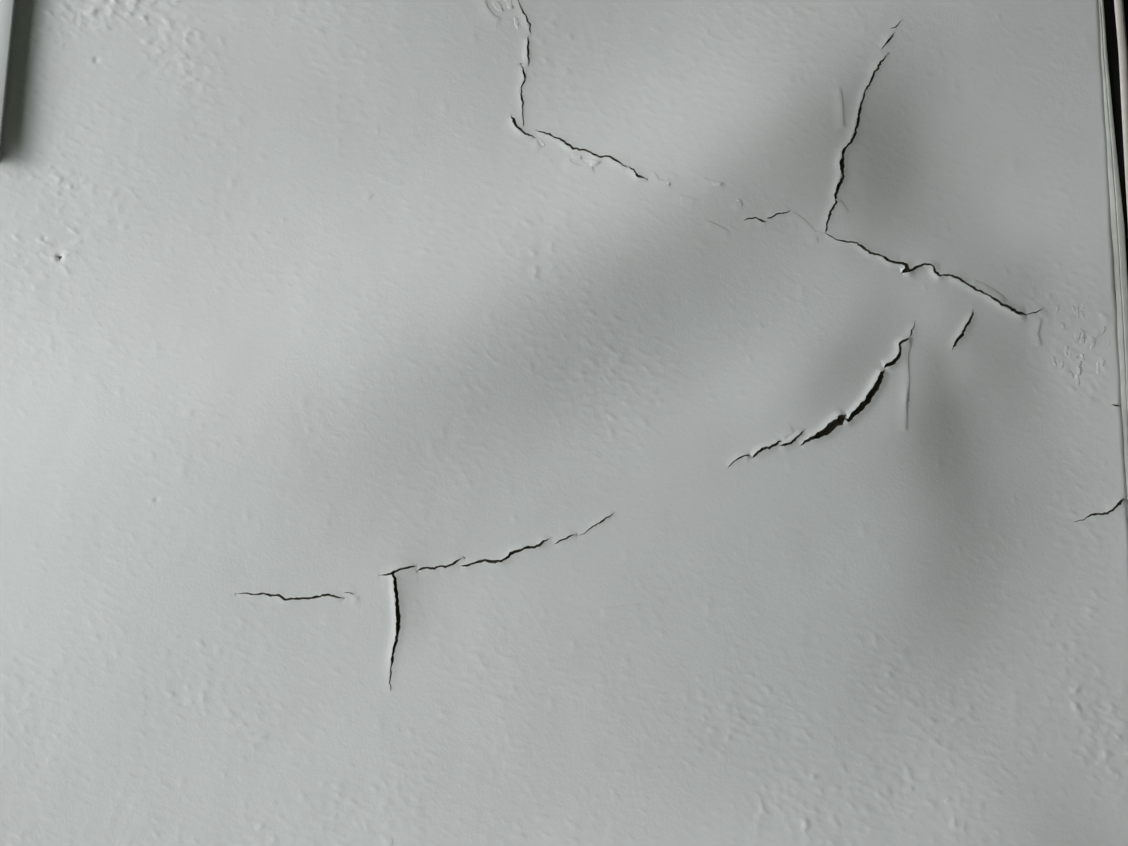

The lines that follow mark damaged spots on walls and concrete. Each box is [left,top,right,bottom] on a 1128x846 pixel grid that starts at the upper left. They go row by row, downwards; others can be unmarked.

crack [484,0,1046,352]
crack [726,321,918,470]
crack [1072,496,1128,526]
crack [236,589,359,604]
crack [379,510,616,693]